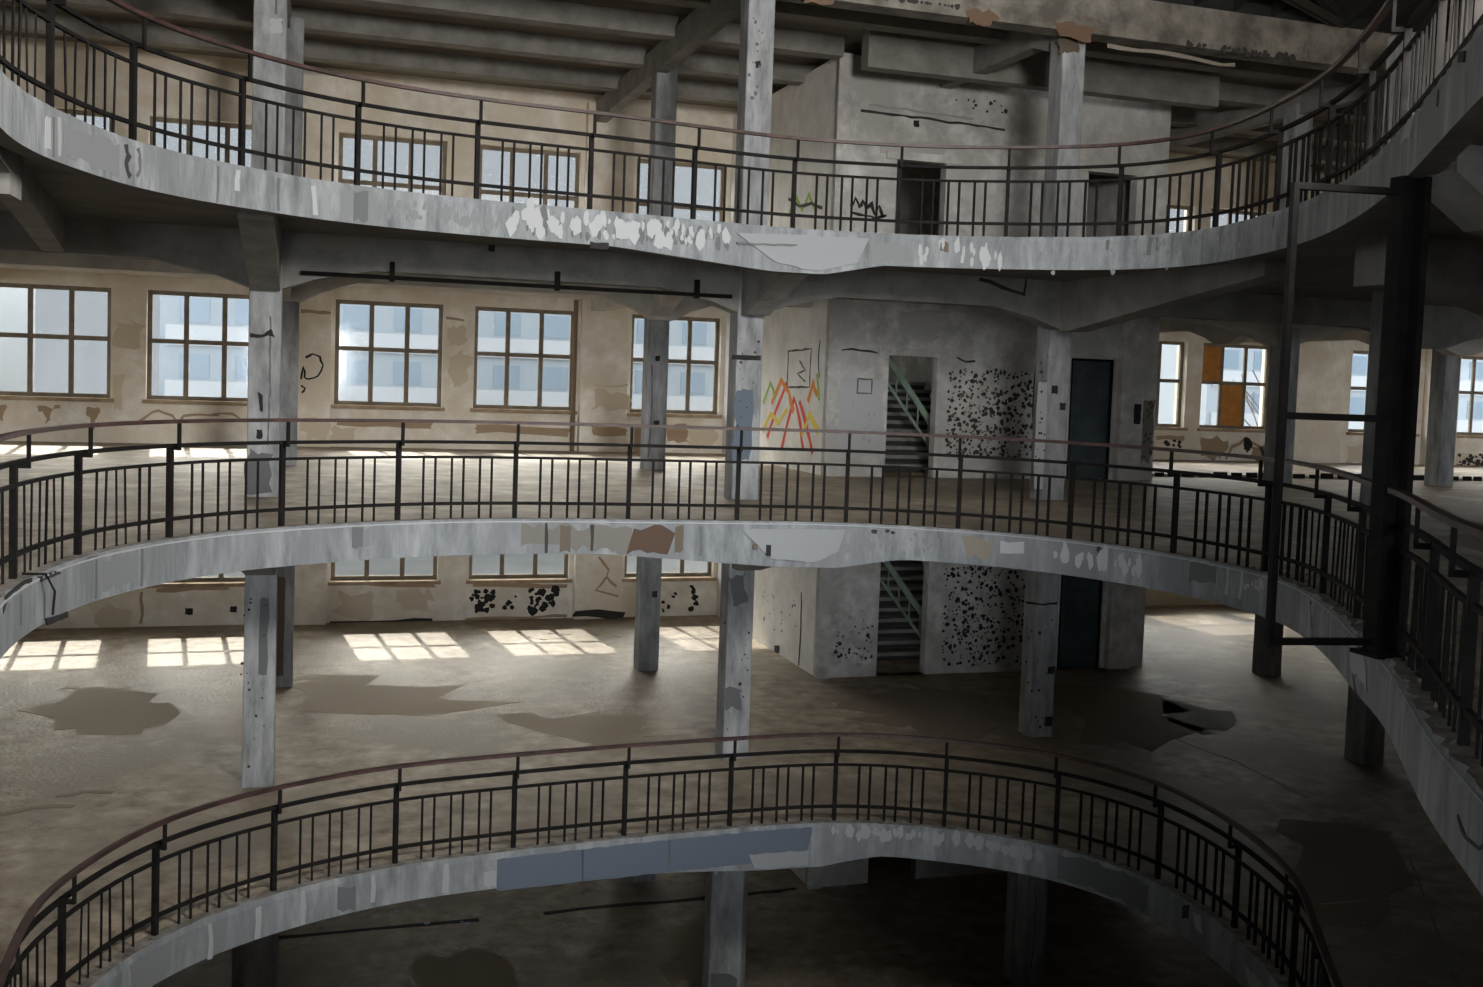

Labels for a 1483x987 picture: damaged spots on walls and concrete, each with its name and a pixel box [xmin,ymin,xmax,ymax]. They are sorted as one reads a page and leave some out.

damp [18,684,180,735]
crack [1457,814,1483,850]